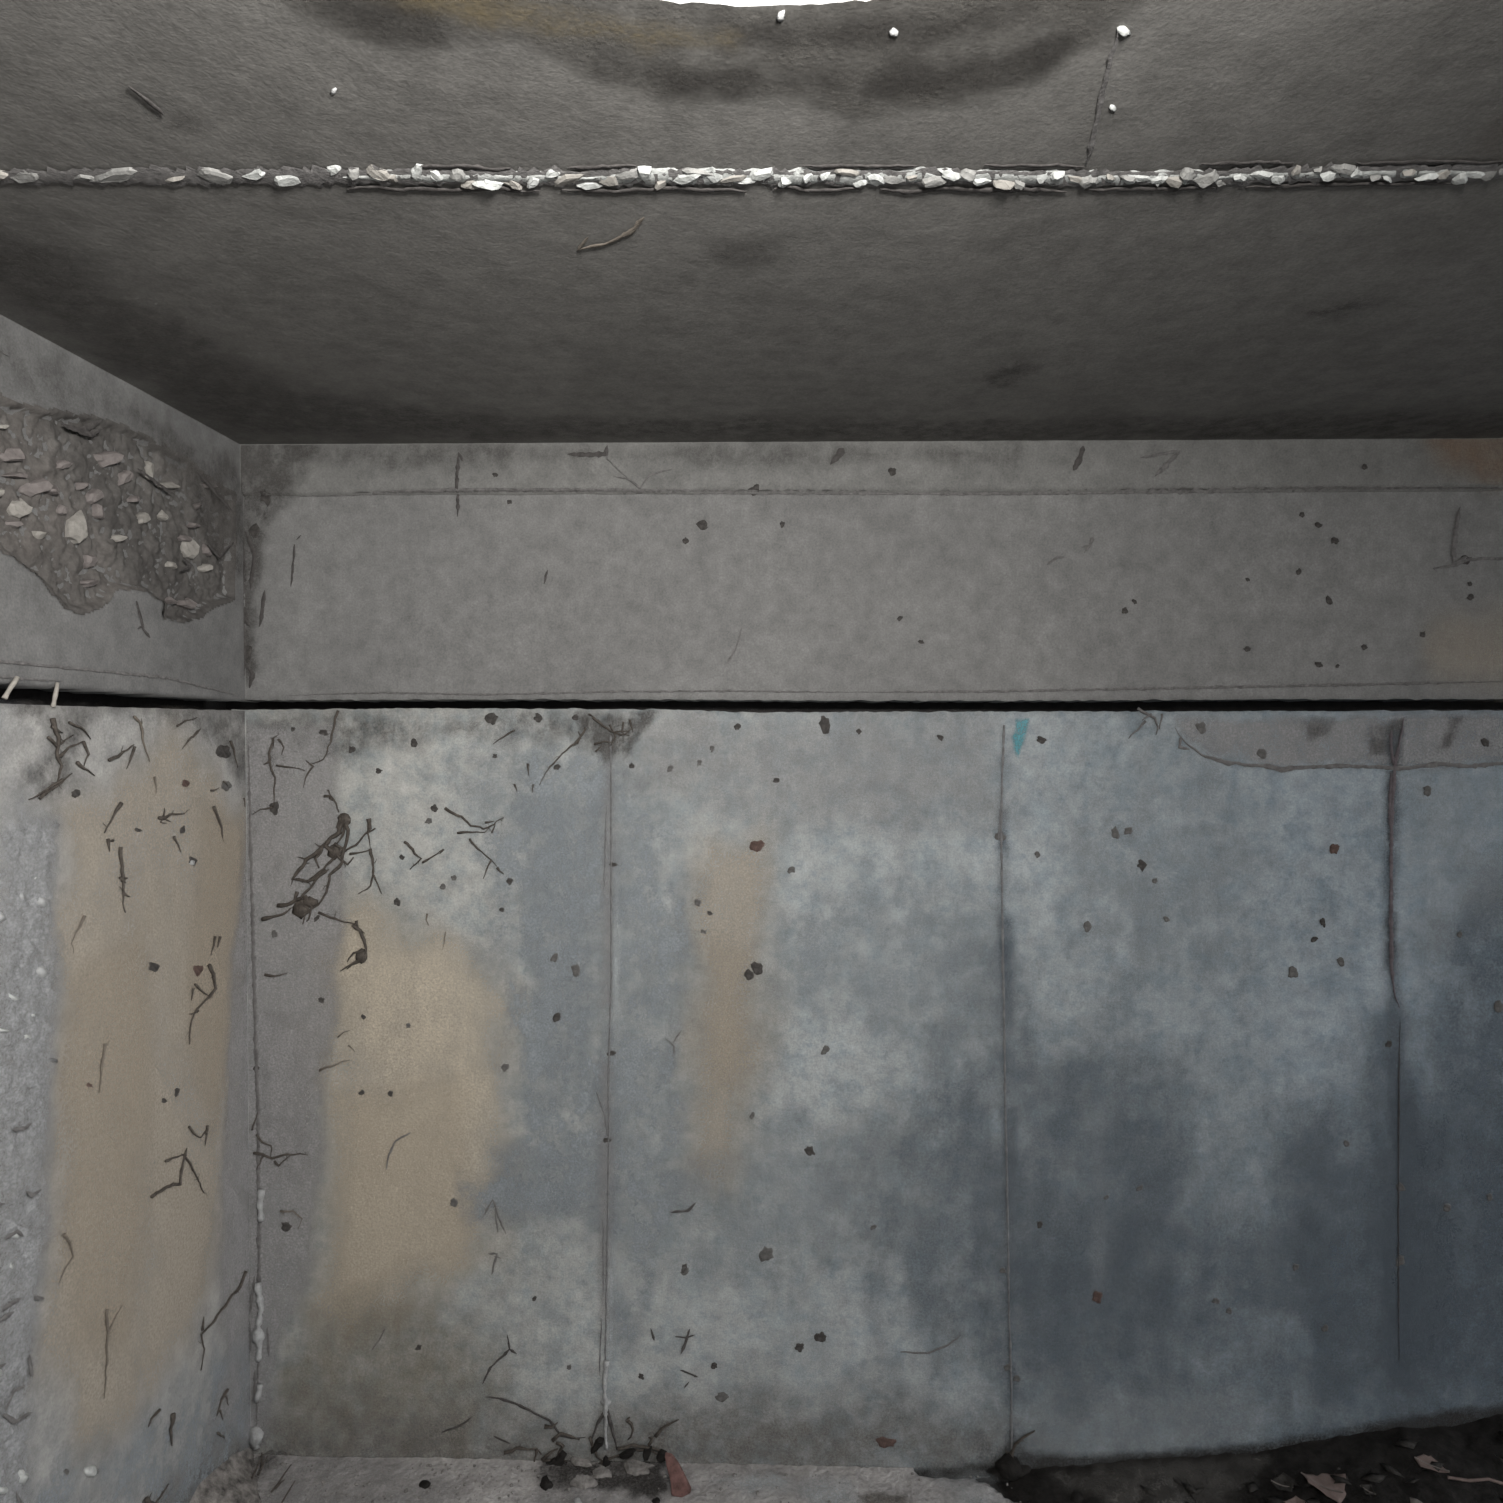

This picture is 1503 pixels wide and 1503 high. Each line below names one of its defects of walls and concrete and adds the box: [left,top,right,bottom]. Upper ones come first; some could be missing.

leakage [292,0,1130,116]
crack [347,32,1503,250]
spalling [0,392,260,624]
leakage [0,801,75,1503]
leakage [103,726,572,1503]
leakage [465,749,689,1294]
leakage [592,1268,997,1489]
crack [290,628,1503,1450]